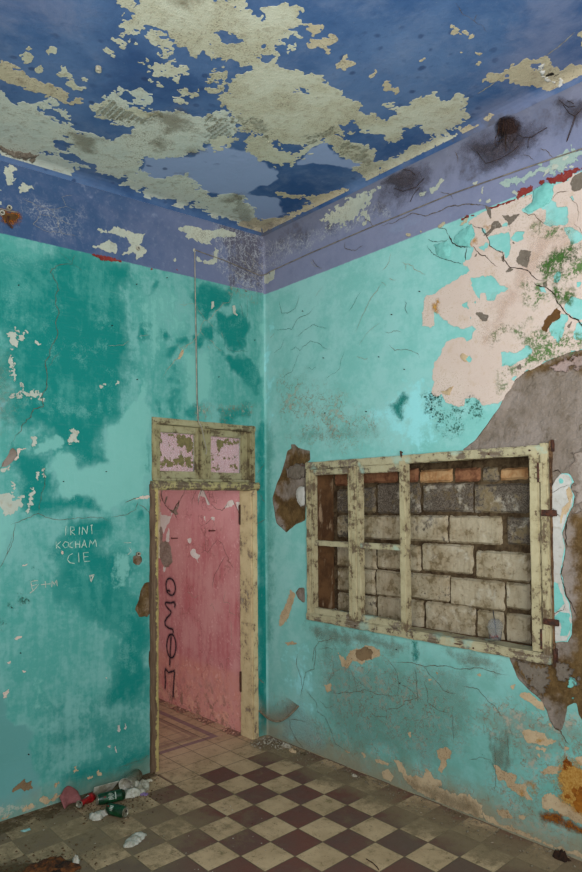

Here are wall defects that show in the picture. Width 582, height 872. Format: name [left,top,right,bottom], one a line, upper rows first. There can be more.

peeling [482,56,582,91]
peeling [0,0,494,265]
crack [365,192,582,326]
peeling [6,327,45,401]
crack [2,257,76,466]
crack [0,475,239,585]
spalling [273,444,310,532]
crack [271,262,423,380]
leakage [424,393,482,434]
peeling [422,144,582,758]
crack [289,638,504,749]
rust [540,757,582,834]